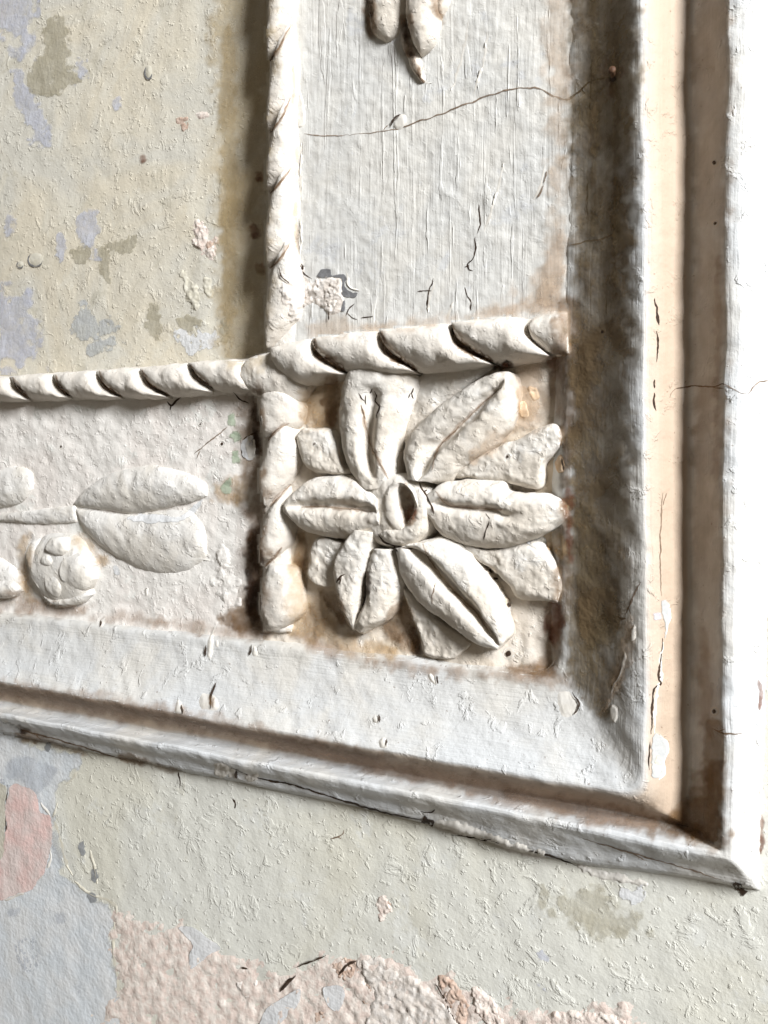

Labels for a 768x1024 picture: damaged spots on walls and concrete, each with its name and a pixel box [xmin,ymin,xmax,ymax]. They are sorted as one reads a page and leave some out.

peeling [27,15,87,97]
crack [304,62,592,136]
flaking render [279,143,359,322]
crack [648,638,664,770]
flaking render [0,721,649,1024]